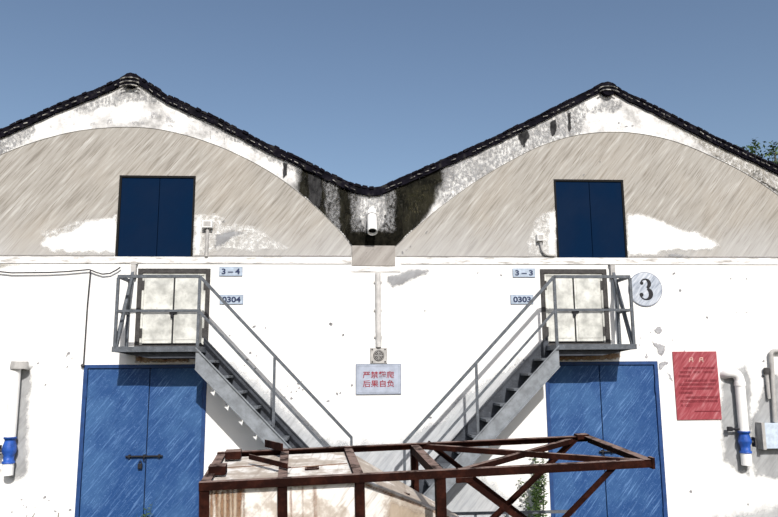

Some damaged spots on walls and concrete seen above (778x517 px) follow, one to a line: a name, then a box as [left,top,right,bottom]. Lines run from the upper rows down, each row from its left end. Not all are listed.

water stain [184,98,622,246]
peeling [41,215,117,253]
peeling [193,215,286,255]
peeling [528,212,556,255]
peeling [627,214,717,257]
water stain [388,269,428,287]